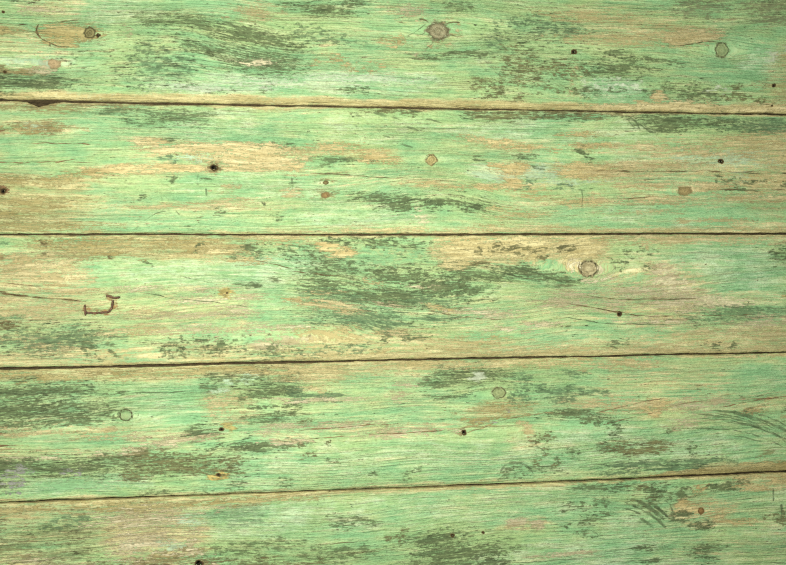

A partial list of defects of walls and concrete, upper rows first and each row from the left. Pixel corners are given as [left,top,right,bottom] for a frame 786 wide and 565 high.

peeling [569,66,786,112]
peeling [0,130,786,480]
peeling [0,477,330,565]
peeling [326,514,384,531]
peeling [557,497,611,538]
peeling [643,461,786,531]
peeling [683,540,729,564]